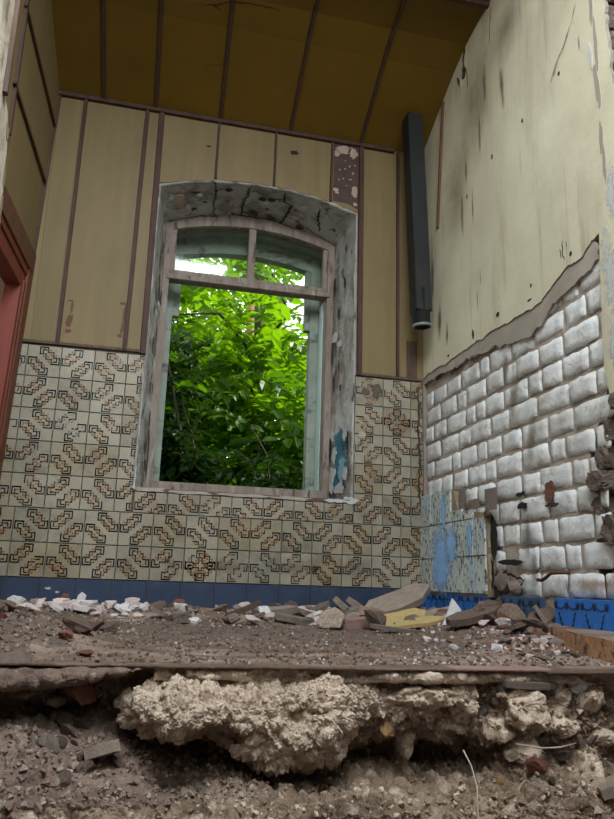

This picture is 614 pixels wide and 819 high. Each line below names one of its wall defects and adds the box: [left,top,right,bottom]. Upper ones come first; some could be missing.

spalling [457,48,468,90]
peeling [588,0,601,108]
spalling [606,0,614,50]
peeling [0,0,15,222]
peeling [333,144,359,209]
peeling [599,121,607,182]
crack [185,184,321,238]
flaking render [426,260,614,600]
peeling [324,427,358,504]